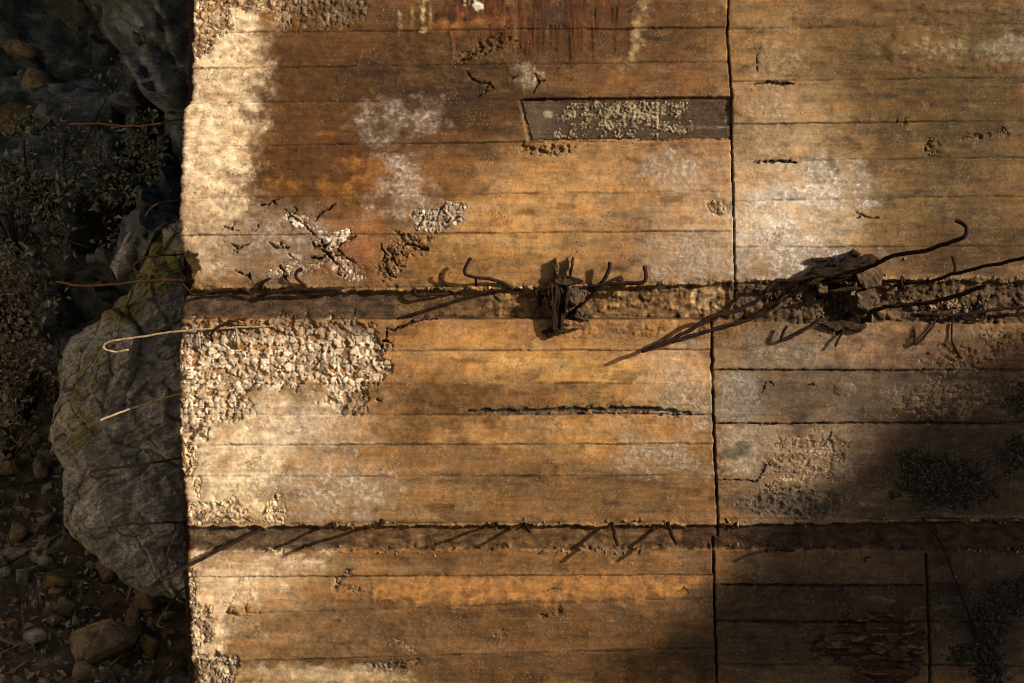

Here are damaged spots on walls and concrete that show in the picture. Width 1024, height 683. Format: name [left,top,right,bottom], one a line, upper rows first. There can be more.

water stain [384,0,536,92]
water stain [180,0,346,275]
water stain [355,100,437,143]
water stain [371,155,428,224]
spalling [55,200,467,298]
spalling [568,262,648,322]
spalling [641,274,817,353]
spalling [780,316,829,341]
spalling [845,219,1024,425]
spalling [89,309,394,683]
spalling [530,518,686,557]